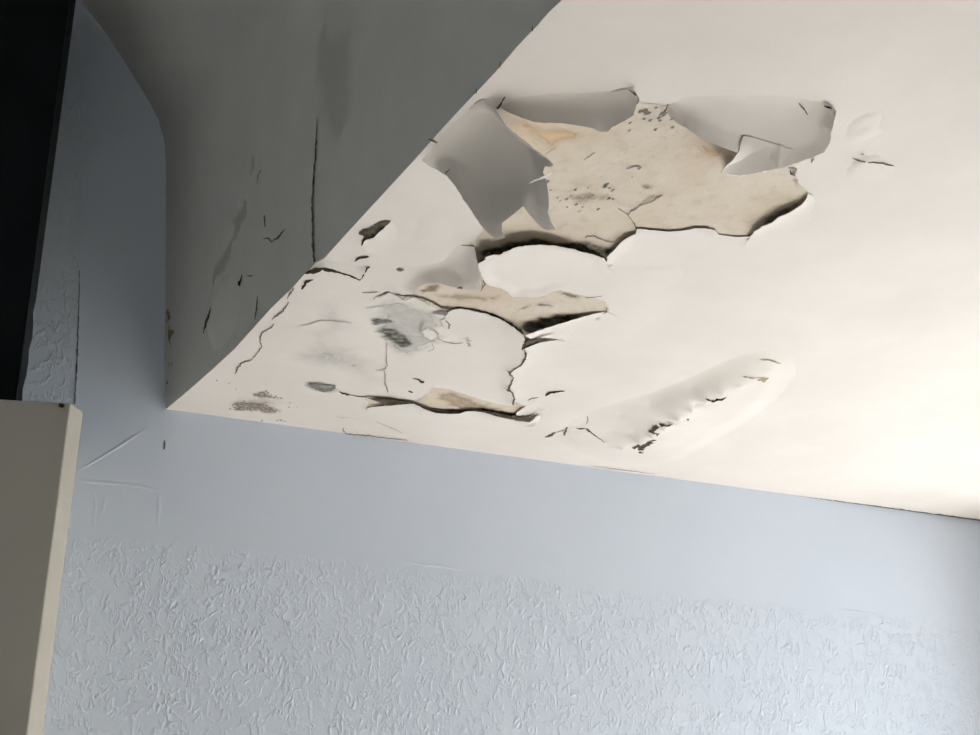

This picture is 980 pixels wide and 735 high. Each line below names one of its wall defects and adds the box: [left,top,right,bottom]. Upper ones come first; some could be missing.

crack [235,125,407,374]
mould [368,293,470,352]
peeling [365,387,542,433]
peeling [370,88,836,350]